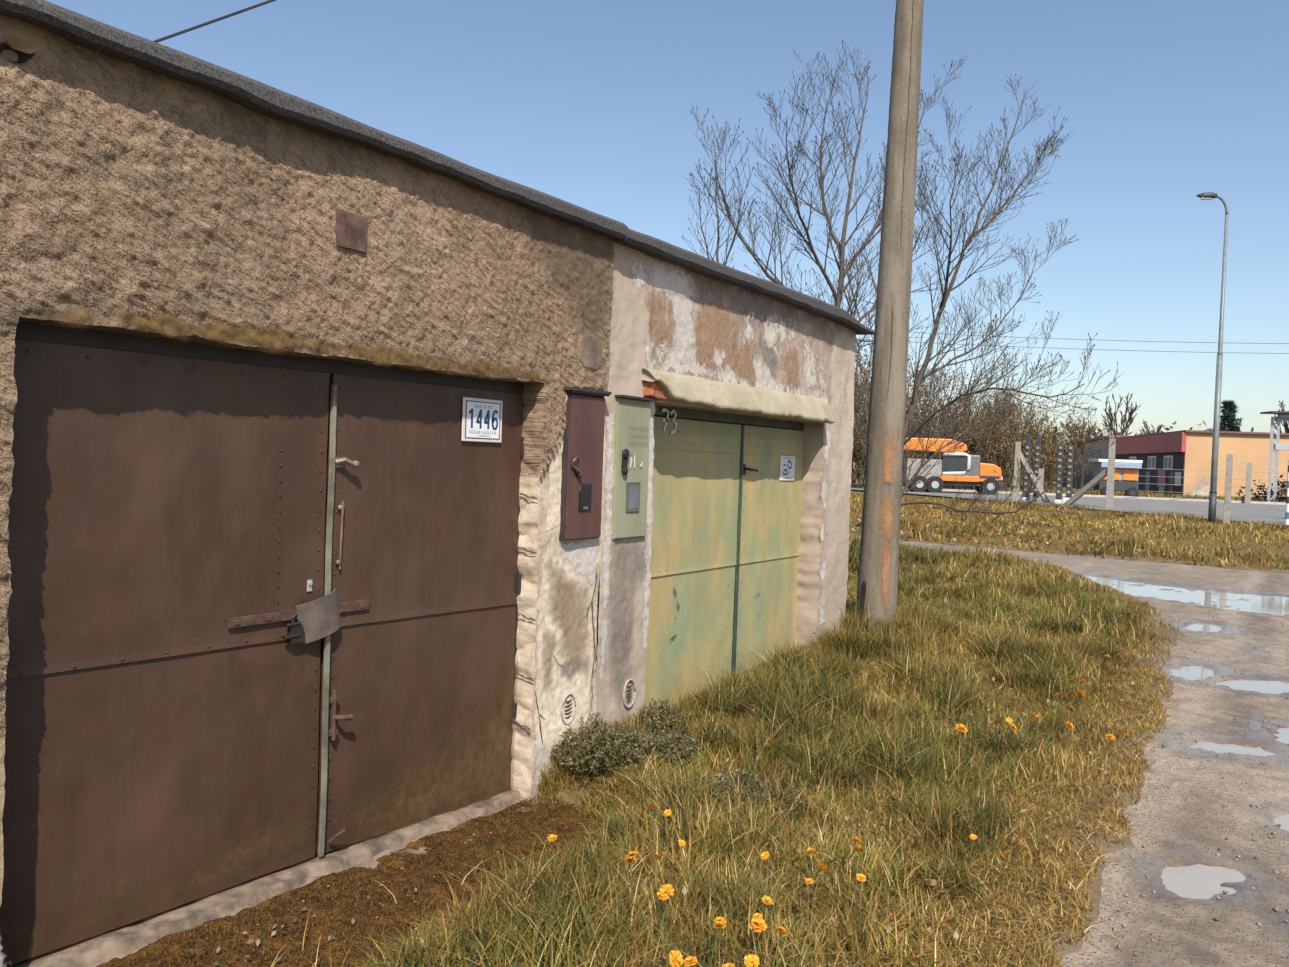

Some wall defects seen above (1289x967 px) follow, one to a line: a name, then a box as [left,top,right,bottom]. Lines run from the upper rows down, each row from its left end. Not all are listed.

flaking render [632,258,831,649]